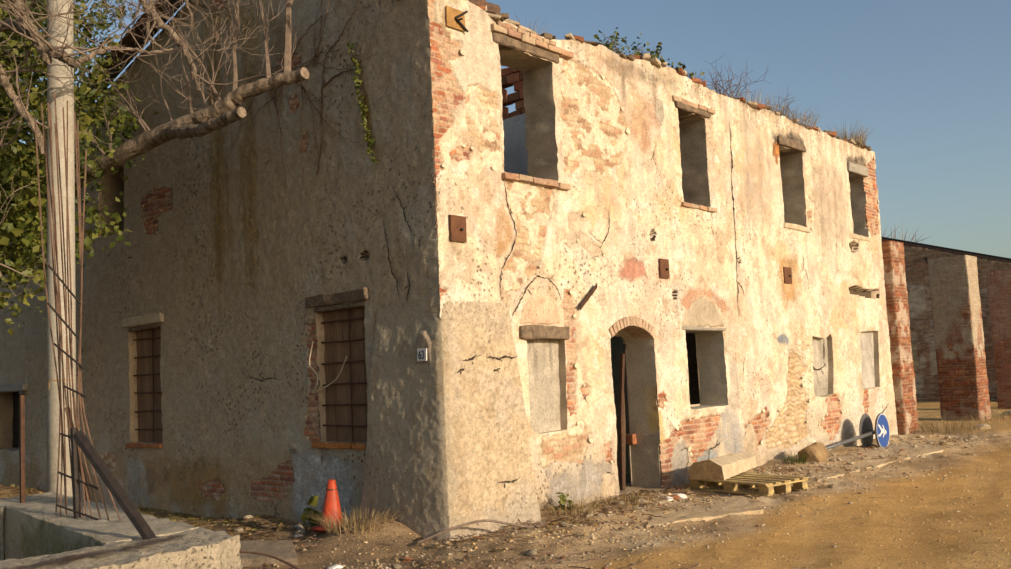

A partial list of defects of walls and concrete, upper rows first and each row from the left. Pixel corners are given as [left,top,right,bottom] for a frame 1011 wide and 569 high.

spalling [427,0,554,292]
spalling [560,58,630,176]
crack [729,108,744,315]
spalling [251,457,295,506]
spalling [302,319,320,442]
spalling [540,290,593,468]
spalling [603,443,613,464]
spalling [659,414,720,488]
spalling [744,350,844,450]